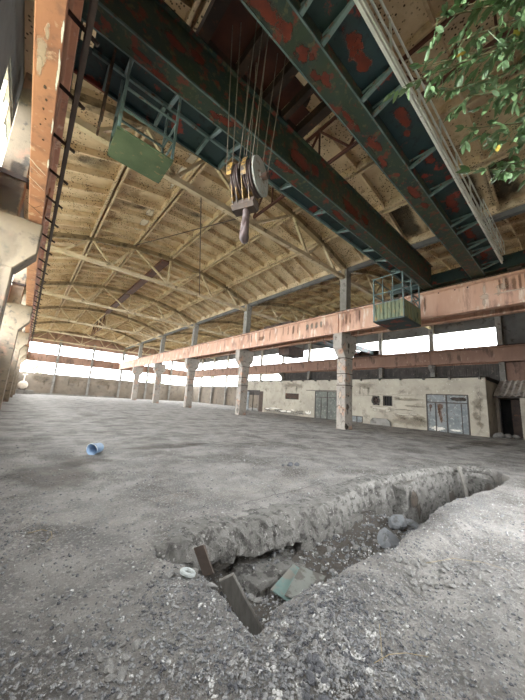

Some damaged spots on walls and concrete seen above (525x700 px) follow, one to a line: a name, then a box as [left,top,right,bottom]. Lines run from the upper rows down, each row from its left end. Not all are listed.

corrosion [246,0,293,43]
peeling [37,23,50,74]
spalling [43,21,65,90]
corrosion [342,27,372,73]
corrosion [393,106,412,137]